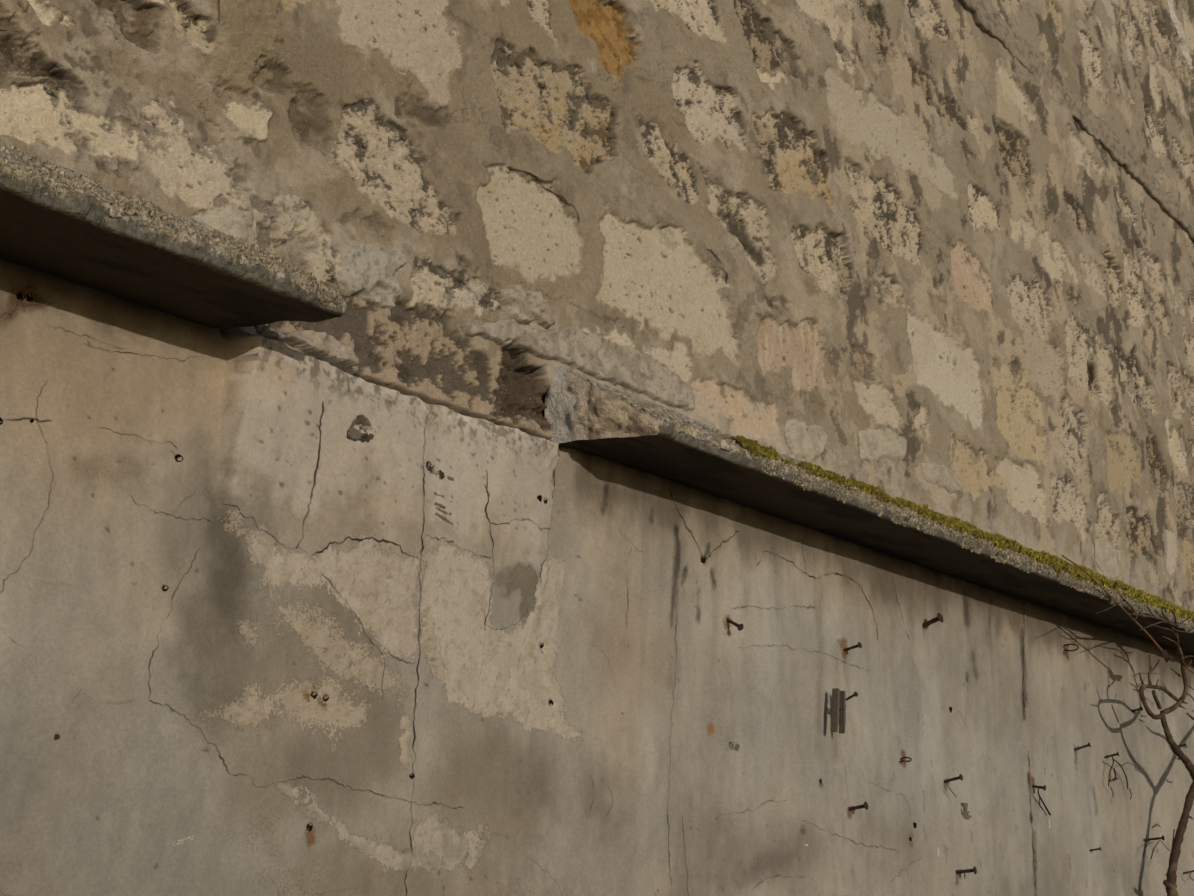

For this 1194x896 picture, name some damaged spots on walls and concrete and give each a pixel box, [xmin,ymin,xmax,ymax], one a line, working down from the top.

crack [15,385,52,422]
spalling [346,415,374,443]
crack [272,401,441,578]
crack [485,470,550,557]
peeling [196,504,587,769]
crack [352,609,421,762]
crack [292,776,463,896]
peeling [272,781,492,875]
crack [667,816,689,896]